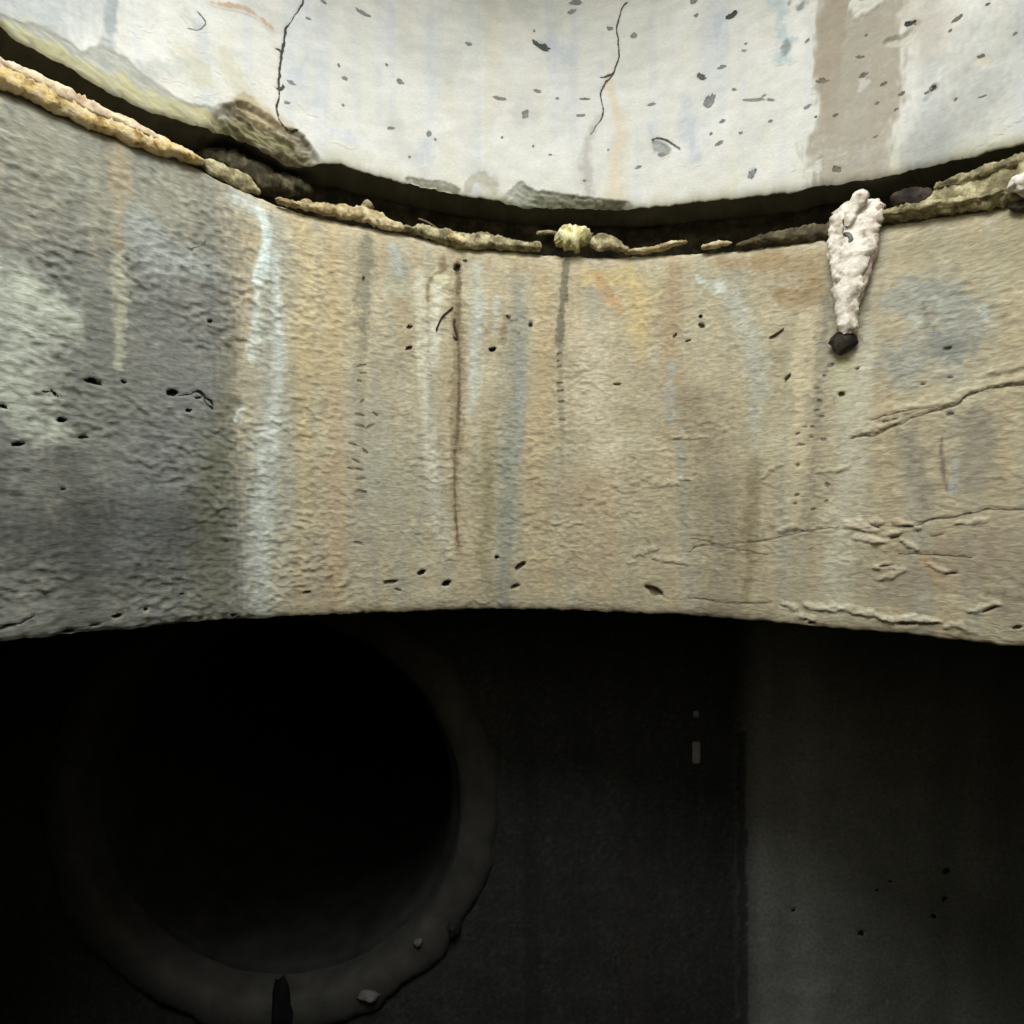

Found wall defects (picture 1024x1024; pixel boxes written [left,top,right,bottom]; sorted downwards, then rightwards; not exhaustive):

peeling [0,10,321,199]
crack [275,0,304,134]
crack [590,2,628,135]
leakage [765,0,1024,190]
crack [851,384,1024,439]
leakage [0,90,304,1024]
leakage [339,210,1024,1024]
crack [688,596,771,604]
crack [689,526,840,555]
crack [899,508,1024,558]